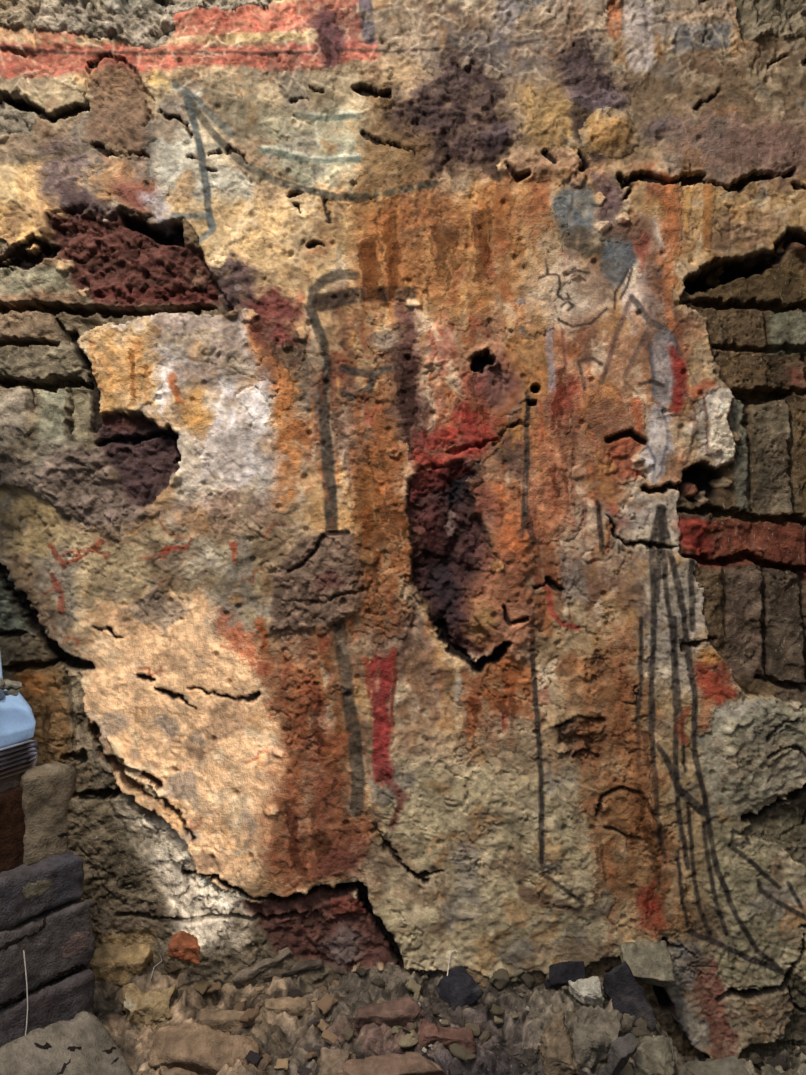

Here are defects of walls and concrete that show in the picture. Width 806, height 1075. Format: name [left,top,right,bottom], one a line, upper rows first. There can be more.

flaking render [0,163,219,317]
water stain [353,42,528,204]
water stain [543,26,806,247]
crack [616,168,806,200]
flaking render [683,226,806,296]
flaking render [67,329,183,518]
flaking render [677,398,742,506]
flaking render [0,563,96,673]
flaking render [406,462,505,664]
crack [134,673,261,710]
peeling [712,690,806,825]
flaking render [241,879,406,975]